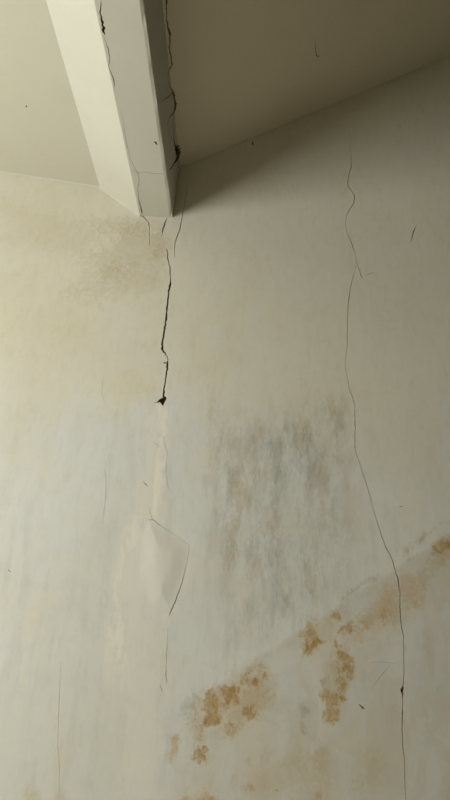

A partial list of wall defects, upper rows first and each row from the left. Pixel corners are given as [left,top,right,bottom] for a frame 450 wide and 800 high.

crack [99,6,115,87]
crack [123,0,188,406]
crack [345,163,406,800]